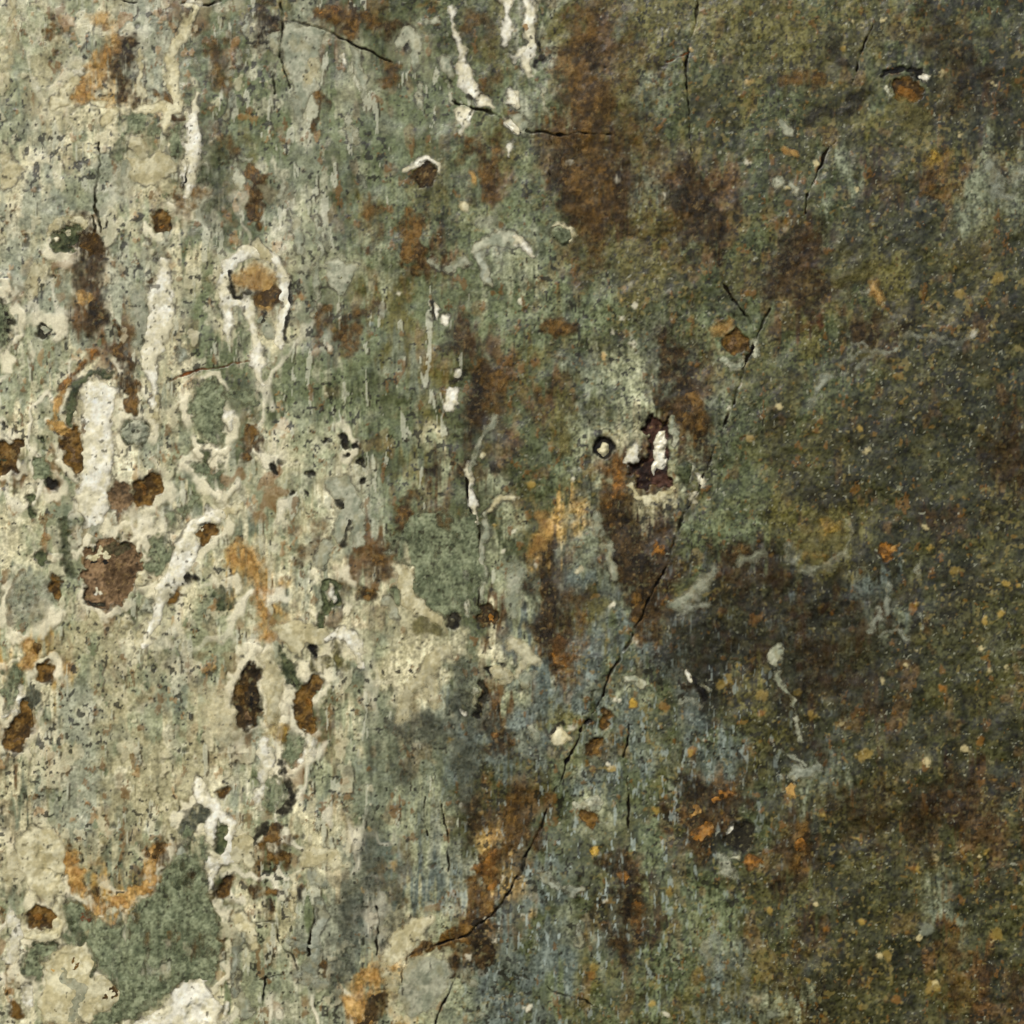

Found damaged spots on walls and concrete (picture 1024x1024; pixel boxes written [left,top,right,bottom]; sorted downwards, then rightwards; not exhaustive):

crack [336,36,392,62]
crack [452,100,612,136]
rust [550,8,630,252]
crack [723,284,771,369]
spalling [34,495,201,610]
crack [465,477,480,540]
spalling [593,414,680,508]
crack [561,456,712,780]
spalling [232,661,263,733]
crack [622,726,630,827]
rust [343,786,542,1024]
crack [434,808,547,946]